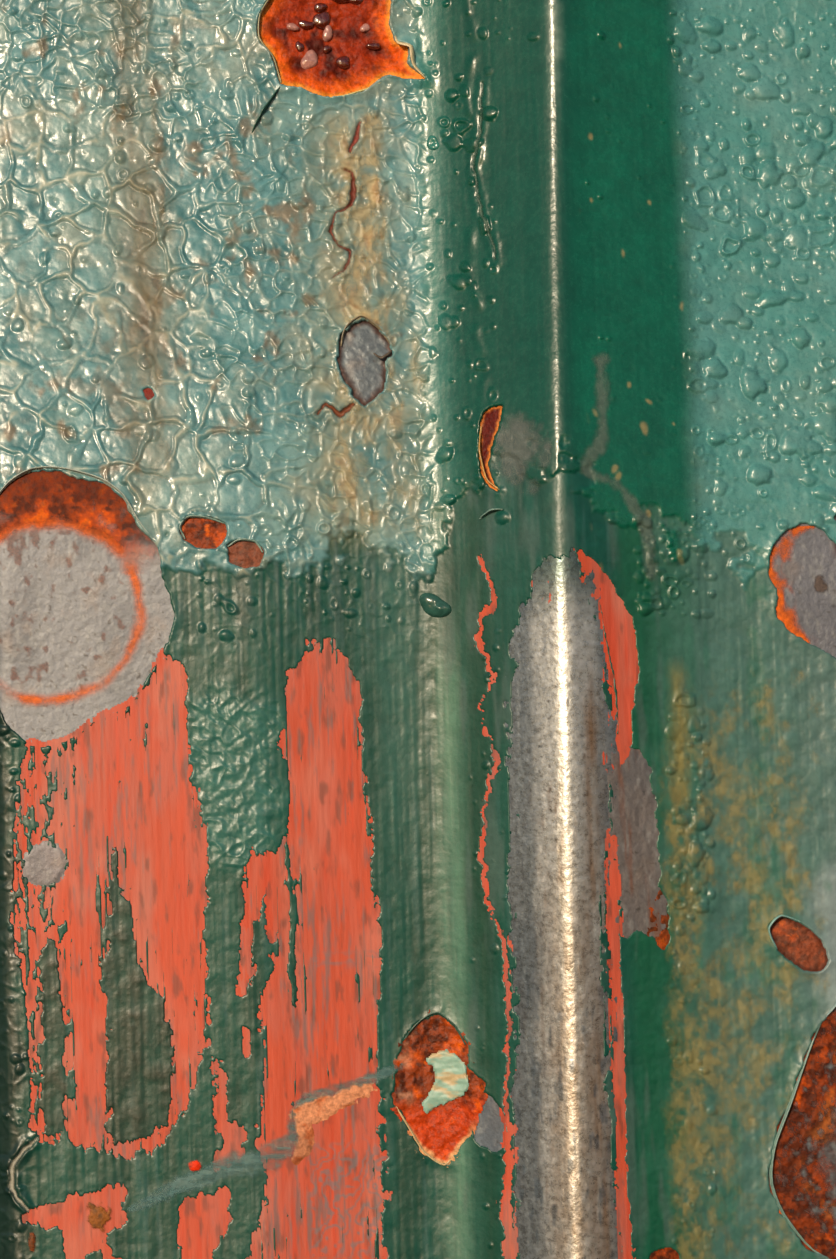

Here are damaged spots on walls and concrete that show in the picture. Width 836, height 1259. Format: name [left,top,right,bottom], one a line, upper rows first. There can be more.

rust [251,0,425,133]
crack [329,122,360,275]
peeling [0,466,175,742]
peeling [769,524,836,658]
peeling [21,841,69,888]
peeling [474,548,670,1259]
peeling [768,915,828,972]
peeling [288,1080,377,1165]
rust [390,1009,488,1166]
peeling [769,1004,836,1259]
peeling [650,1248,679,1259]